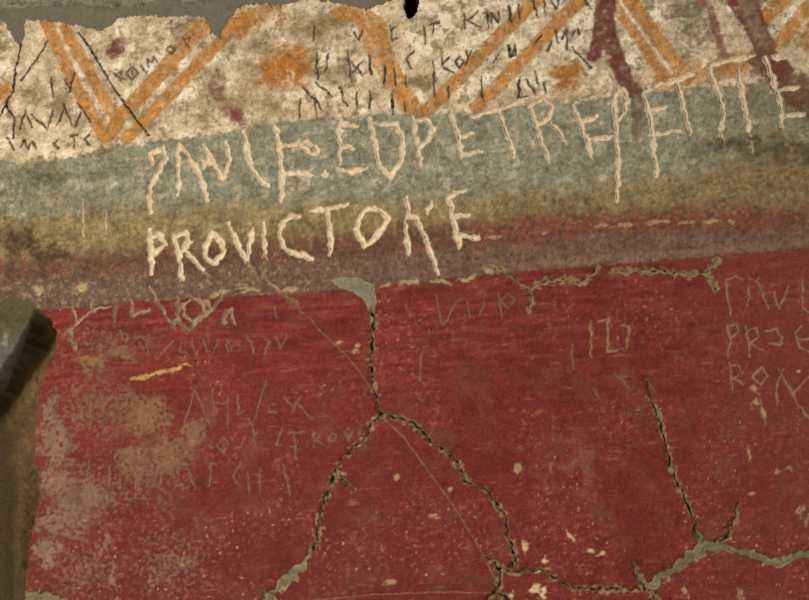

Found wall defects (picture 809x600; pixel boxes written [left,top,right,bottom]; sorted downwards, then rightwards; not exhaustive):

hole [403,0,419,19]
peeling [210,286,261,299]
peeling [379,278,419,288]
peeling [430,267,494,285]
crack [490,257,722,314]
spalling [0,286,207,600]
crack [262,305,809,600]
crack [25,588,68,600]